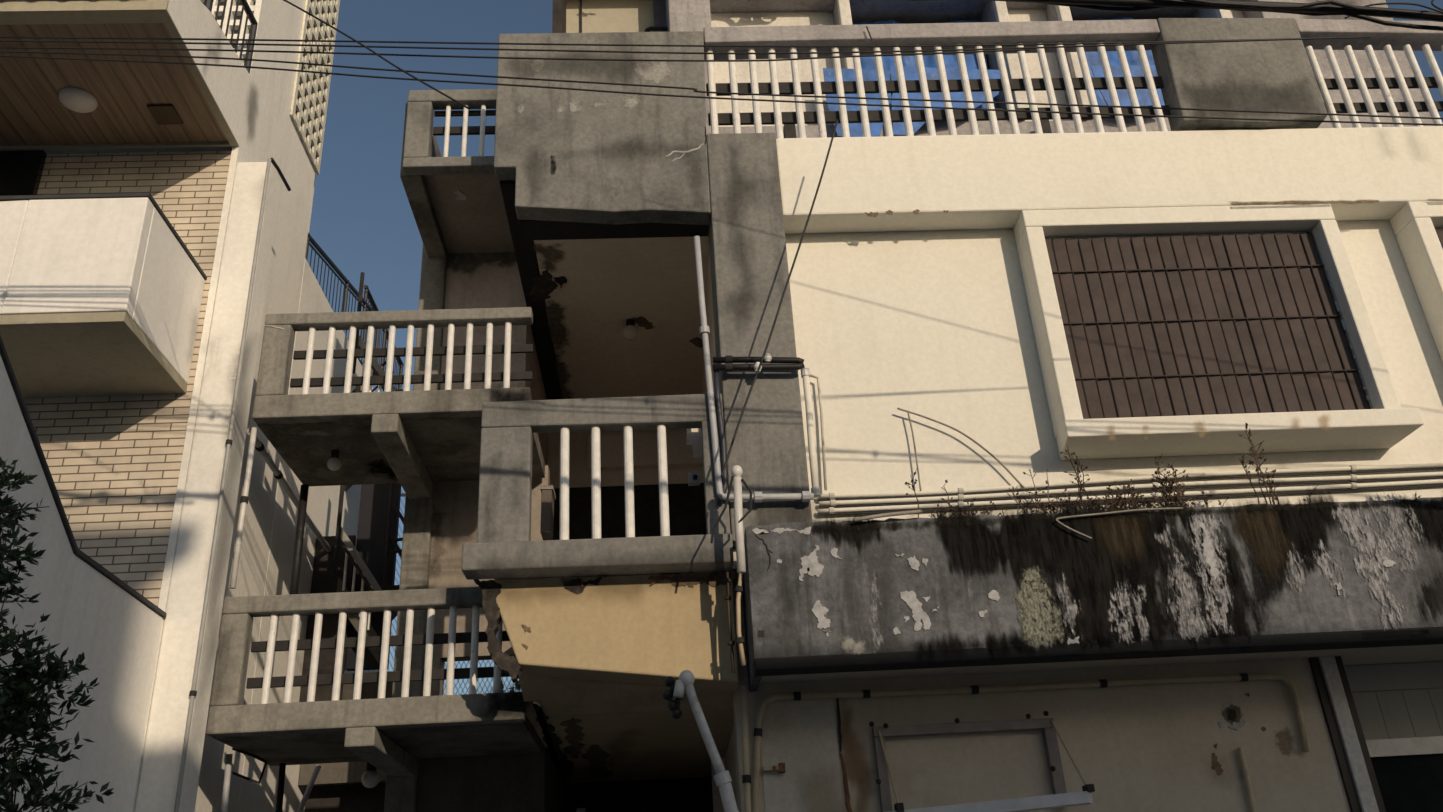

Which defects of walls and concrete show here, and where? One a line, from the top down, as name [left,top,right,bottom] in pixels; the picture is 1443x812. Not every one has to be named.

spalling [529,270,567,302]
spalling [473,579,531,683]
spalling [560,576,602,594]
spalling [648,571,735,588]
peeling [752,526,842,581]
peeling [812,568,939,654]
peeling [895,554,928,571]
damp [813,493,1443,660]
spalling [533,701,613,779]
spalling [1211,693,1266,776]